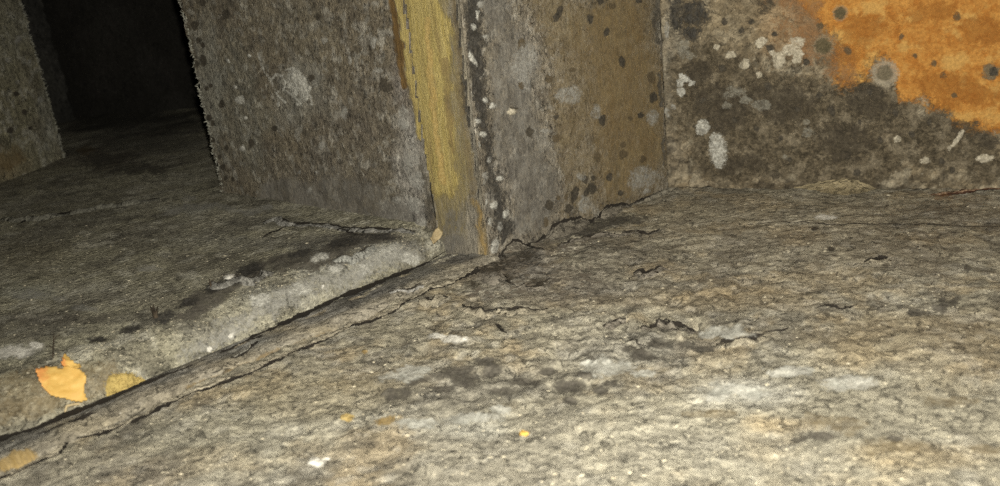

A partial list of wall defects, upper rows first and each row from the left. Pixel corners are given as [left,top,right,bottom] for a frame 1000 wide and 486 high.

damp [453,0,538,287]
damp [544,173,612,226]
damp [567,215,649,240]
damp [628,0,1000,185]
corrosion [780,0,1000,134]
crack [0,186,711,479]